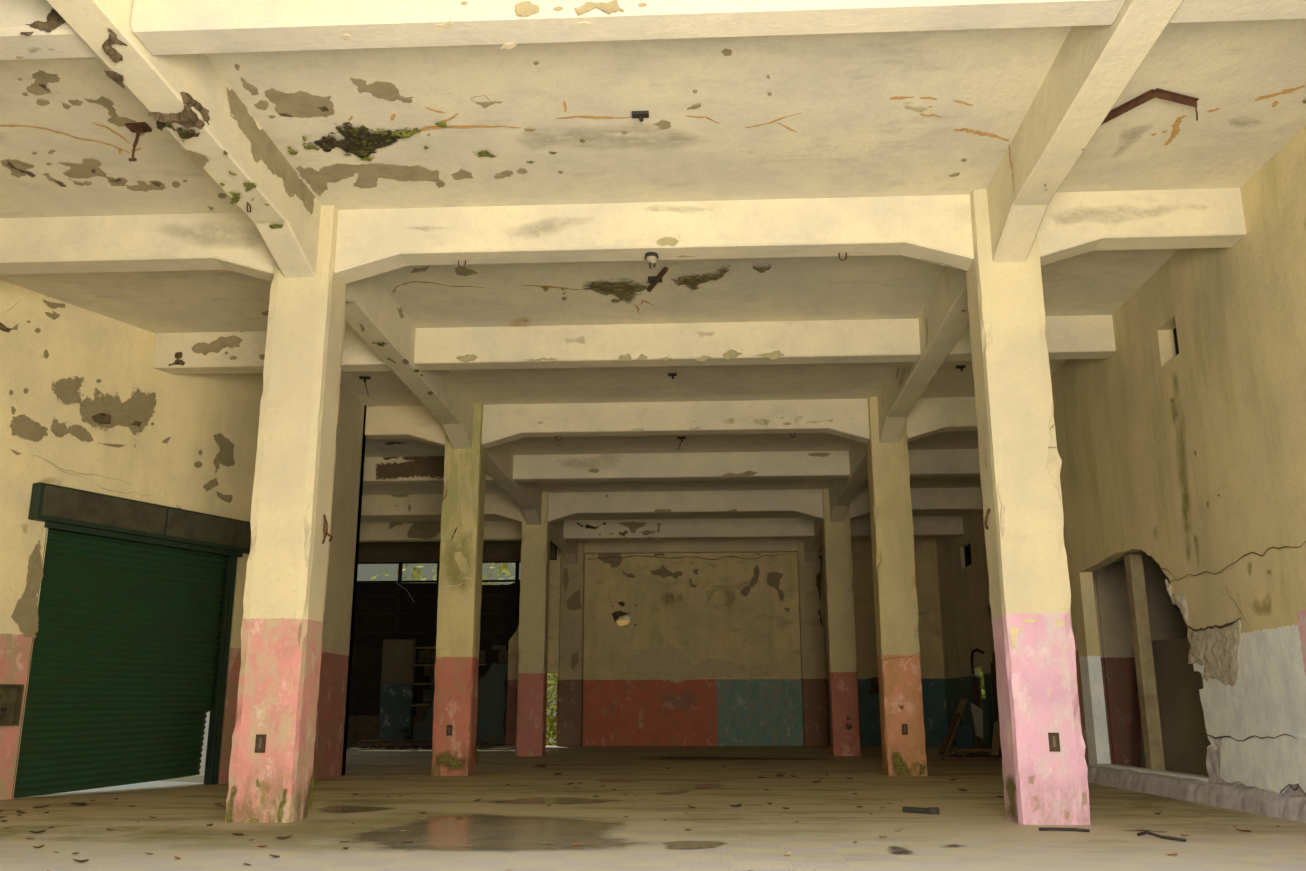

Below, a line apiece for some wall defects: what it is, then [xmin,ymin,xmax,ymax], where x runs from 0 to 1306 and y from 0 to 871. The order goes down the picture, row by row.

spalling [18,70,210,136]
peeling [226,63,473,215]
peeling [0,296,65,333]
peeling [9,376,157,455]
peeling [194,433,235,503]
peeling [11,540,44,639]
spalling [611,602,636,626]
peeling [740,553,791,612]
spalling [1165,579,1241,686]
crack [1150,541,1306,638]
spalling [1206,736,1253,788]